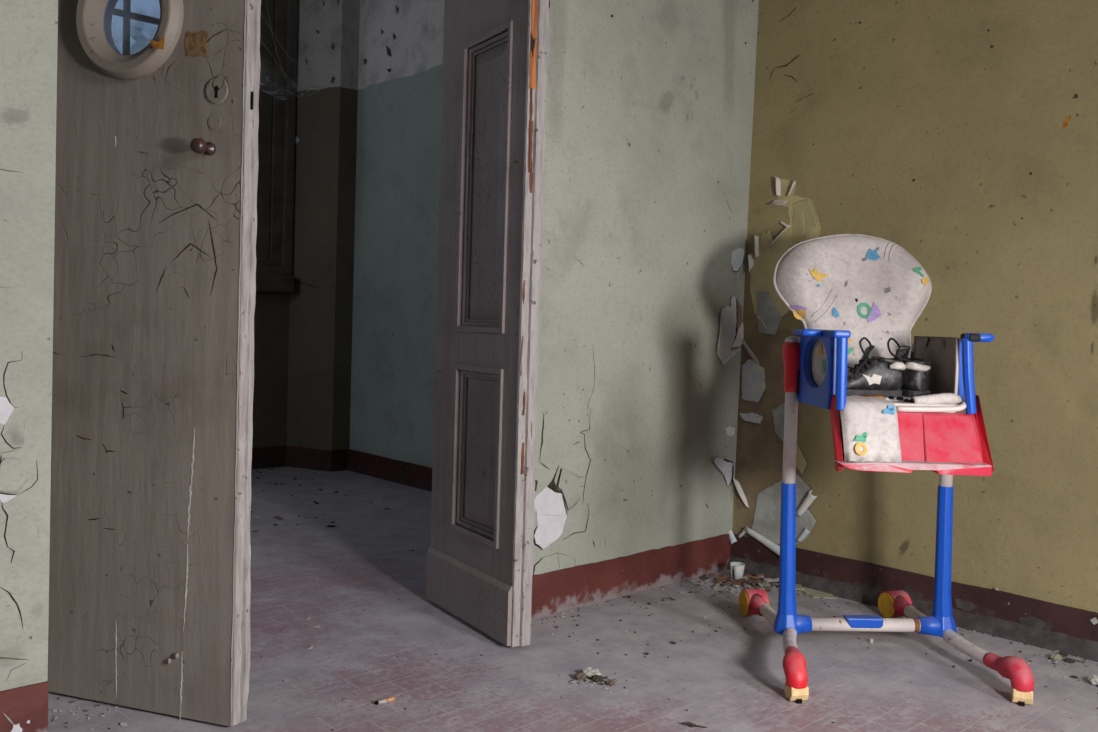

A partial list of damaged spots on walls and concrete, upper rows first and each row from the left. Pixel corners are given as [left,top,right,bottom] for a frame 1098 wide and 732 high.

peeling [0,360,38,563]
crack [539,413,550,470]
peeling [533,465,589,575]
crack [574,350,595,498]
peeling [713,176,821,556]
crack [0,587,23,627]